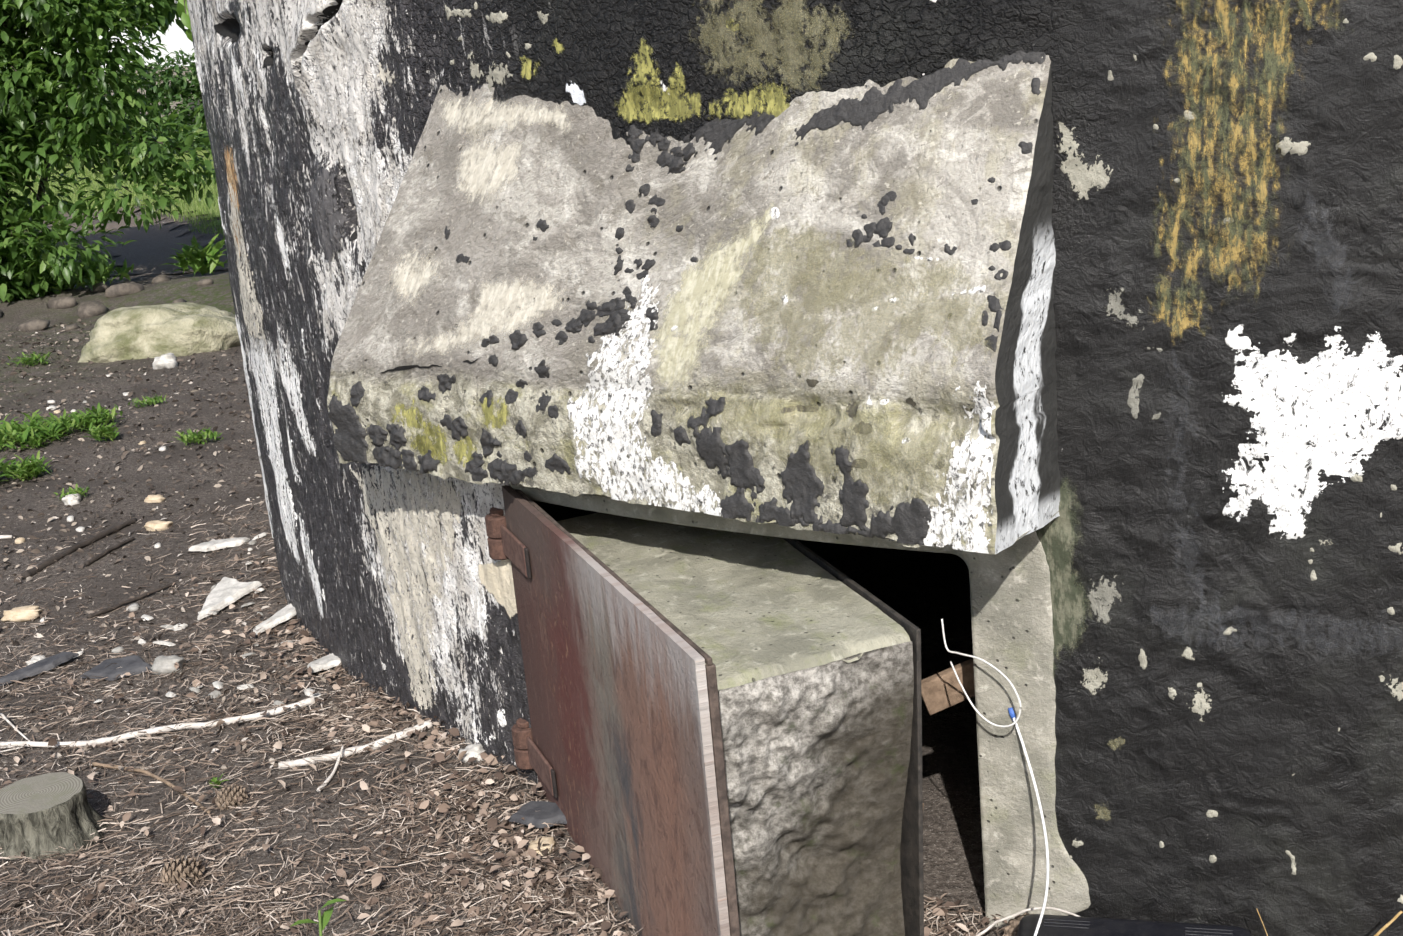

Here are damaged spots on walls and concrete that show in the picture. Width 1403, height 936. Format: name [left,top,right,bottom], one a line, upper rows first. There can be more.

flaking render [214,0,403,265]
peeling [625,125,696,174]
peeling [1018,141,1033,154]
peeling [1057,122,1113,200]
flaking render [308,230,356,333]
spalling [405,184,773,387]
peeling [218,179,325,620]
spalling [650,381,996,554]
peeling [1222,324,1403,581]
spalling [188,537,250,552]
spalling [197,577,262,621]
spalling [253,604,296,635]